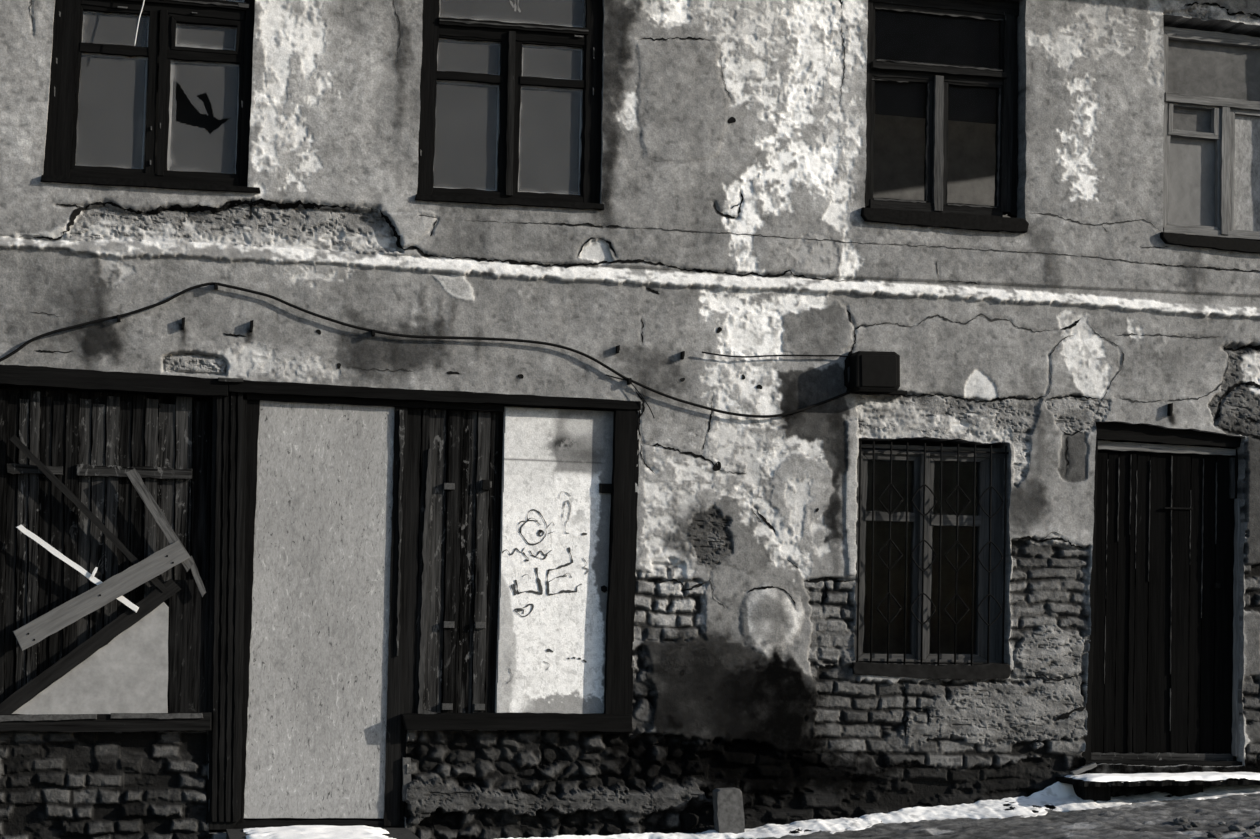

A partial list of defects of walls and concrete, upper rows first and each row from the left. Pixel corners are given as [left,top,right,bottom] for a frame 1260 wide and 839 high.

spalling [17,0,438,292]
crack [837,0,845,111]
peeling [1027,0,1260,202]
crack [21,190,1260,474]
flaking render [406,0,1113,829]
damp [776,363,851,545]
peeling [1127,318,1145,341]
spalling [1208,343,1260,565]
spalling [1242,611,1260,761]